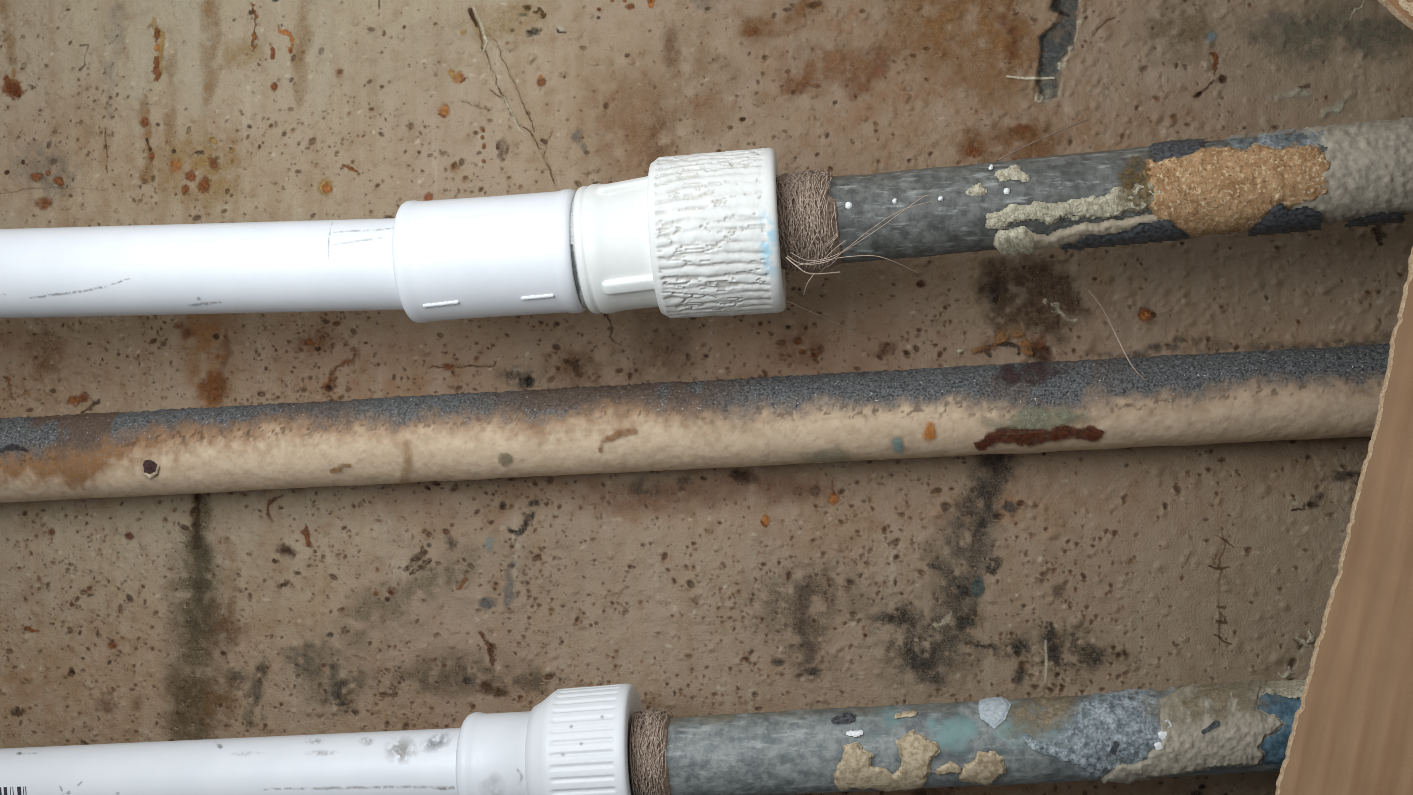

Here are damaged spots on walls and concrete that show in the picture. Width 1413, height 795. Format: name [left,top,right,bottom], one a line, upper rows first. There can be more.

corrosion [2,68,24,99]
corrosion [139,18,164,183]
corrosion [171,138,235,194]
crack [468,7,554,181]
spalling [1006,0,1082,103]
damp [173,493,267,741]
damp [772,575,852,675]
damp [877,454,1101,683]